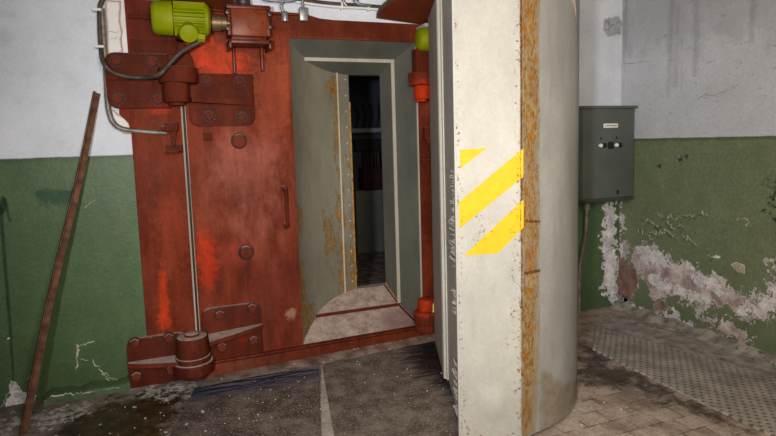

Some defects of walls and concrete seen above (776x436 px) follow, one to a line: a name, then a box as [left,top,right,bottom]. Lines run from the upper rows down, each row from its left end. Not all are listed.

rust [322,184,357,293]
rust [519,0,540,435]
peeling [597,201,776,346]
peeling [0,381,36,408]